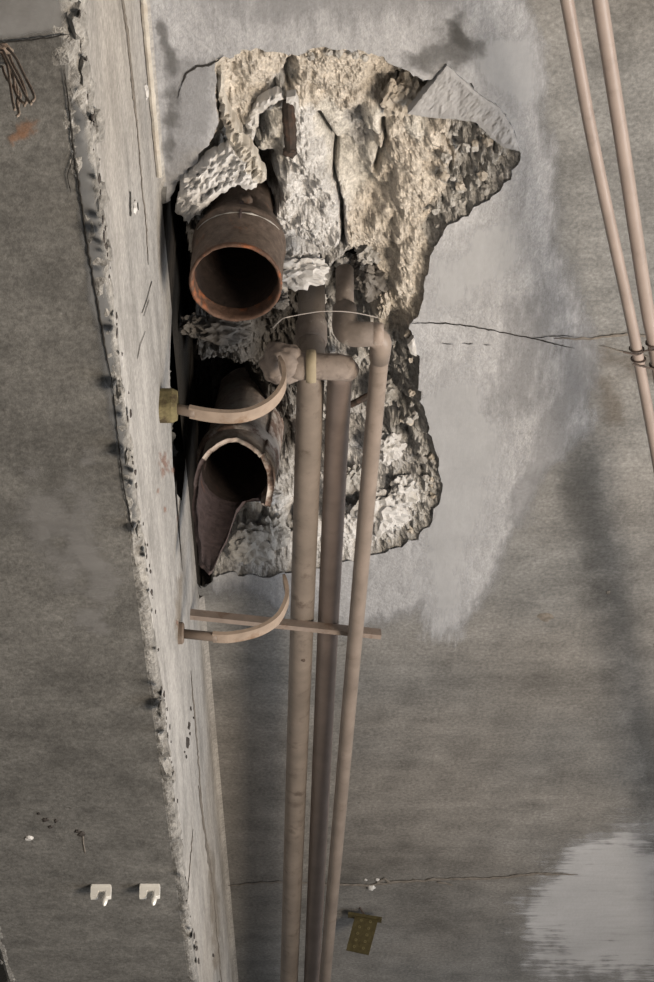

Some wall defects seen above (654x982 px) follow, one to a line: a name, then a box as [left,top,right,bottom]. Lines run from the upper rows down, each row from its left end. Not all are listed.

spalling [172,47,521,589]
crack [411,322,575,349]